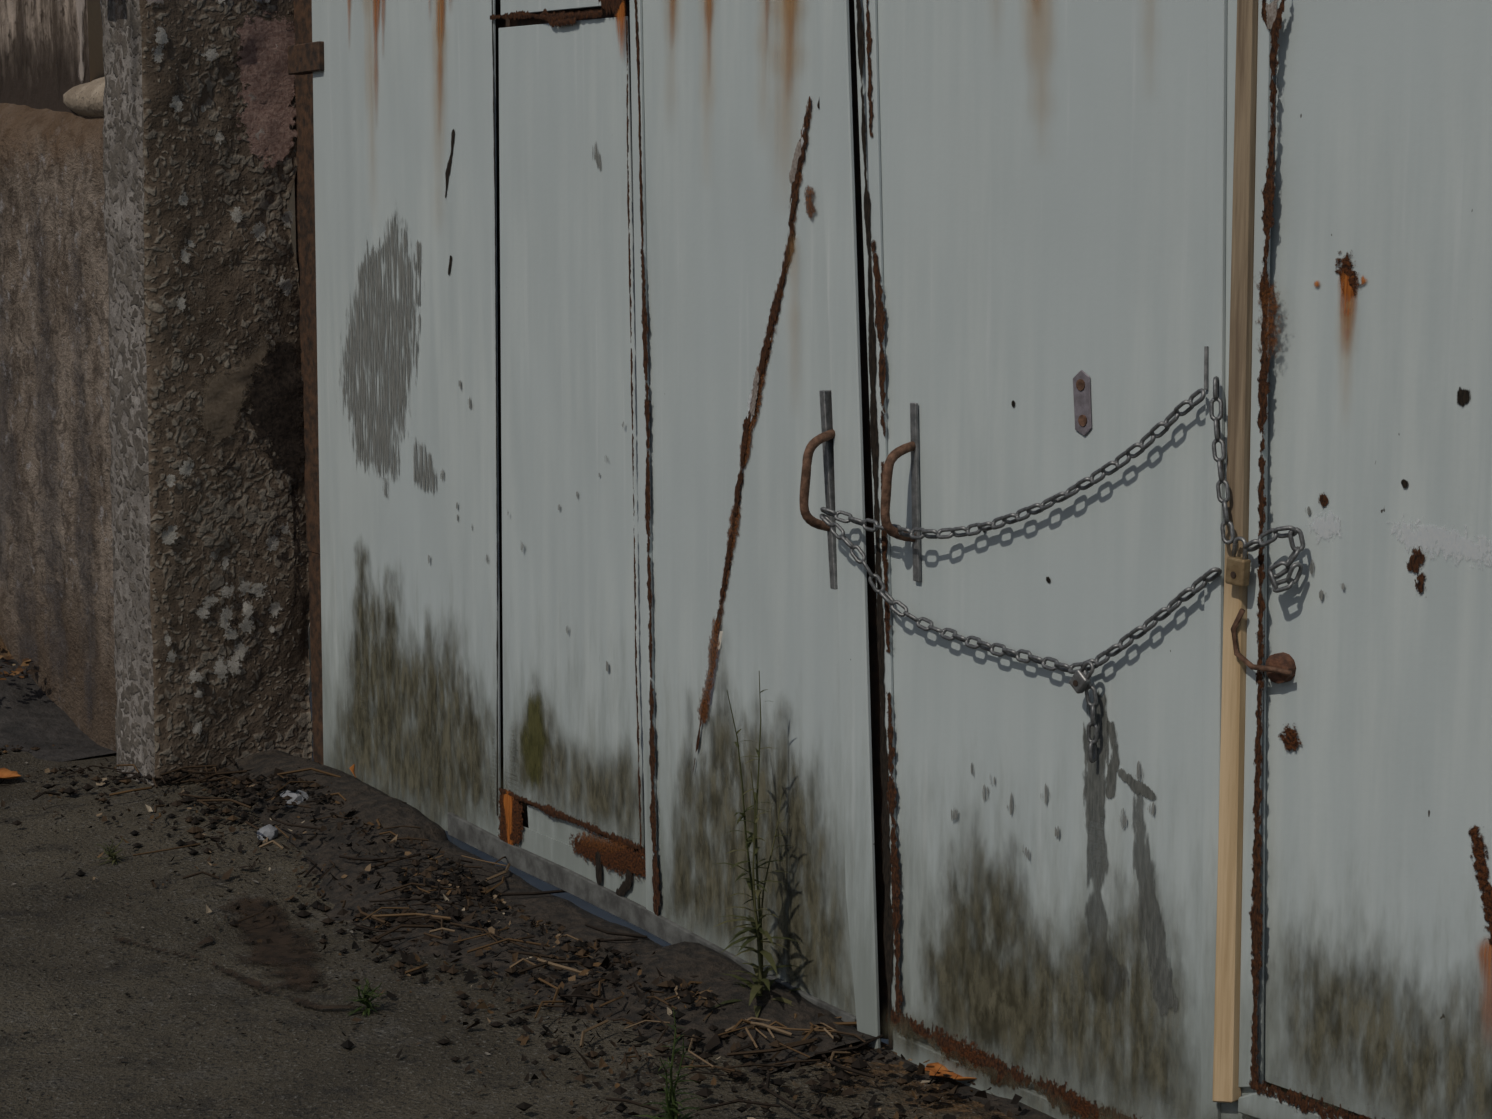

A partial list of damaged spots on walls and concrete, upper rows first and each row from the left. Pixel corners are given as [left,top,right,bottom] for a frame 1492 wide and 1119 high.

corrosion [373,0,383,41]
corrosion [490,0,626,44]
corrosion [1335,250,1366,329]
mould [338,553,494,821]
mould [509,696,638,836]
corrosion [498,787,646,897]
mould [675,726,849,1008]
water stain [930,691,1178,1105]
corrosion [886,1008,1143,1119]
corrosion [1250,1077,1385,1119]